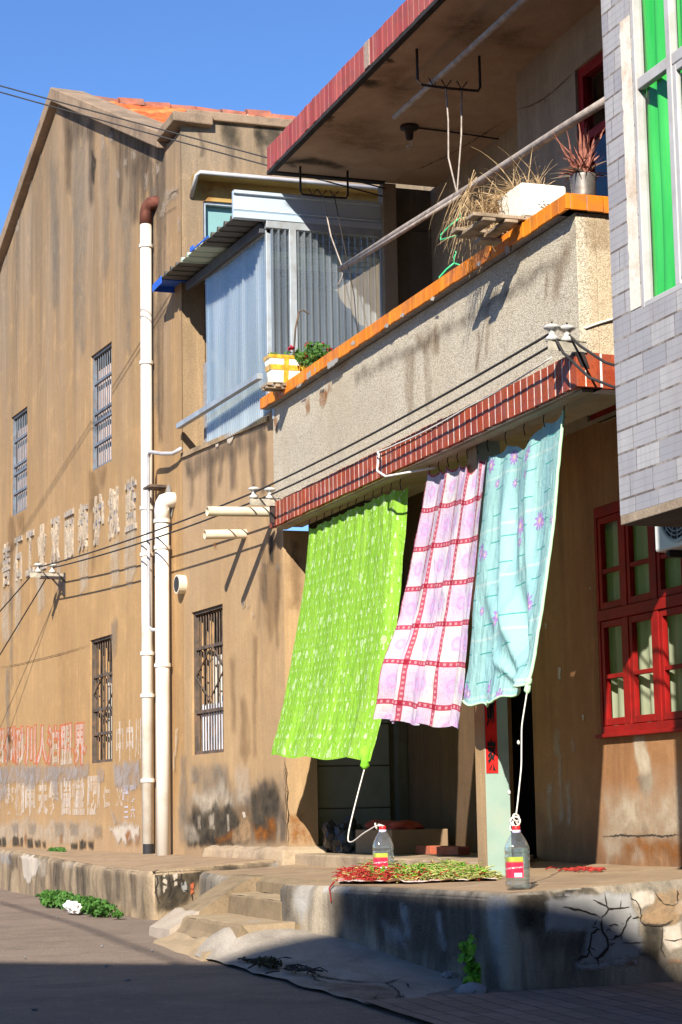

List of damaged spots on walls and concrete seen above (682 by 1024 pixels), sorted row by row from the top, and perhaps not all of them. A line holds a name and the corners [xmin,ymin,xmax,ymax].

water stain [66,109,106,219]
water stain [111,128,165,276]
peeling [110,813,139,844]
spalling [233,812,251,841]
crack [603,832,678,840]
spalling [154,870,203,910]
crack [567,890,680,965]